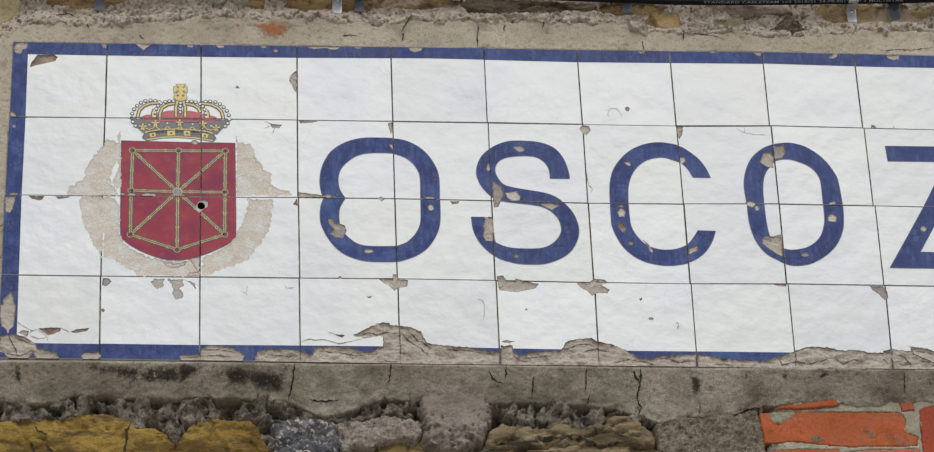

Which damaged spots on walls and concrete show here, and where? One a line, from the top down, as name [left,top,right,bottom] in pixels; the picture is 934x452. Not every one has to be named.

peeling [497,276,539,292]
peeling [577,279,609,296]
peeling [870,286,888,300]
spalling [0,292,89,359]
spalling [180,322,934,370]
crack [633,368,642,413]
crack [491,427,632,449]